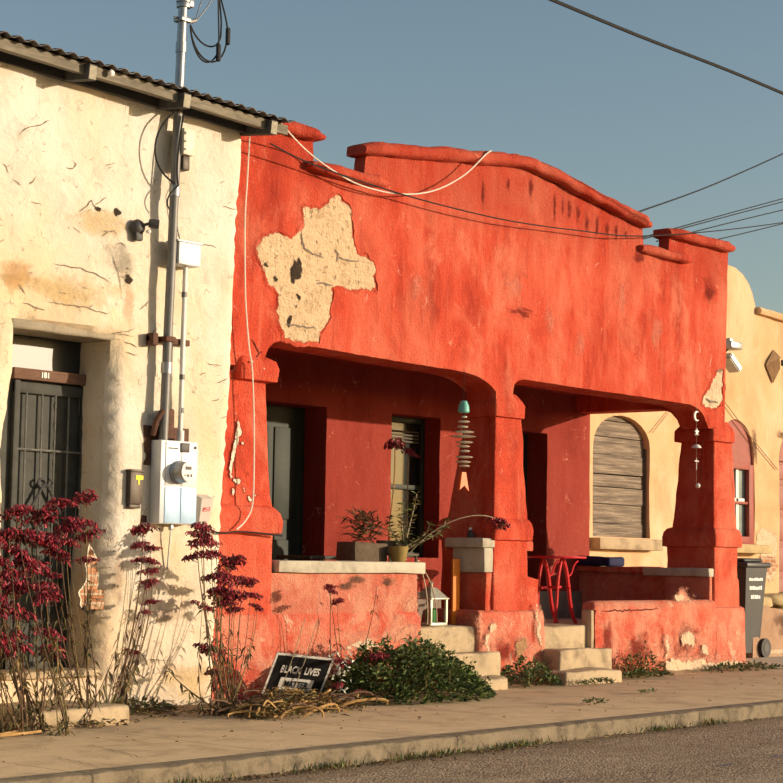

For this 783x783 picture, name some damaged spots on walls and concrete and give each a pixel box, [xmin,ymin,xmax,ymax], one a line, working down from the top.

spalling [253,190,379,347]
spalling [700,367,724,412]
peeling [229,414,258,503]
peeling [663,631,743,671]